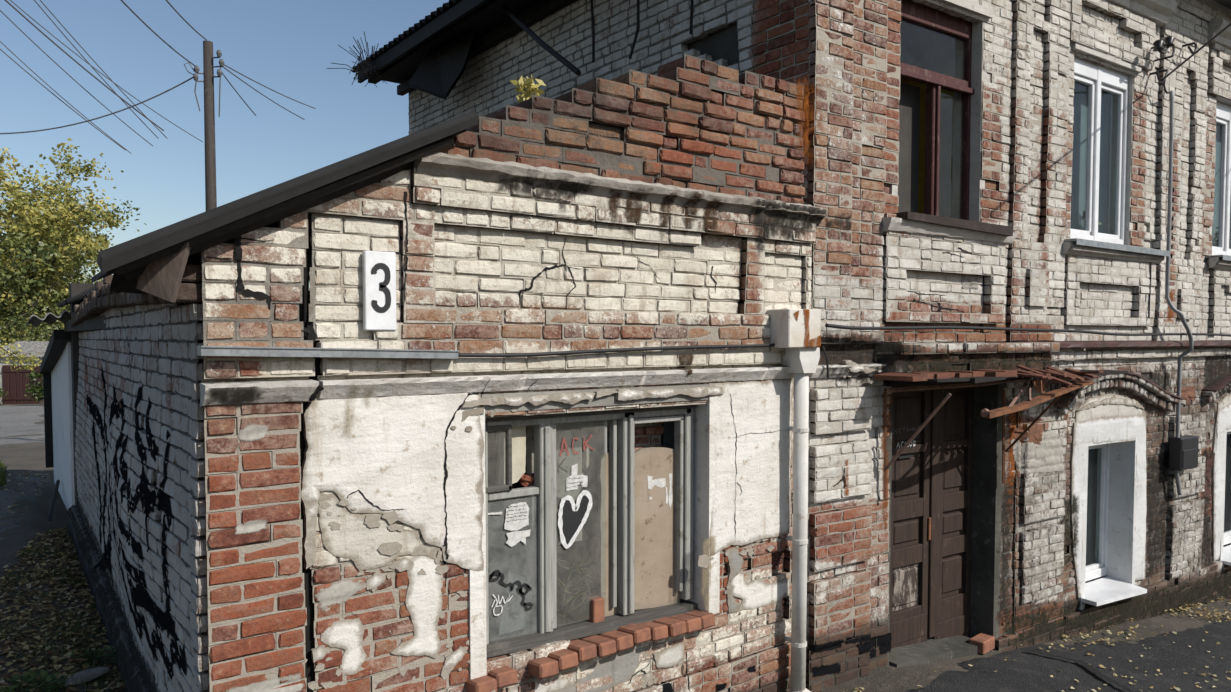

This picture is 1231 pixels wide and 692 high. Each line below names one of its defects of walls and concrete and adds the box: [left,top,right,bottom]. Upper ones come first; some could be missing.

corrosion [797,83,822,157]
damp [499,175,596,209]
damp [609,189,649,233]
damp [659,192,726,241]
crack [518,240,588,310]
crack [201,213,324,467]
crack [437,381,496,586]
crack [300,501,316,692]
flaking render [226,499,470,692]
flaking render [697,537,790,620]
damp [998,448,1231,646]
flaking render [491,643,684,692]